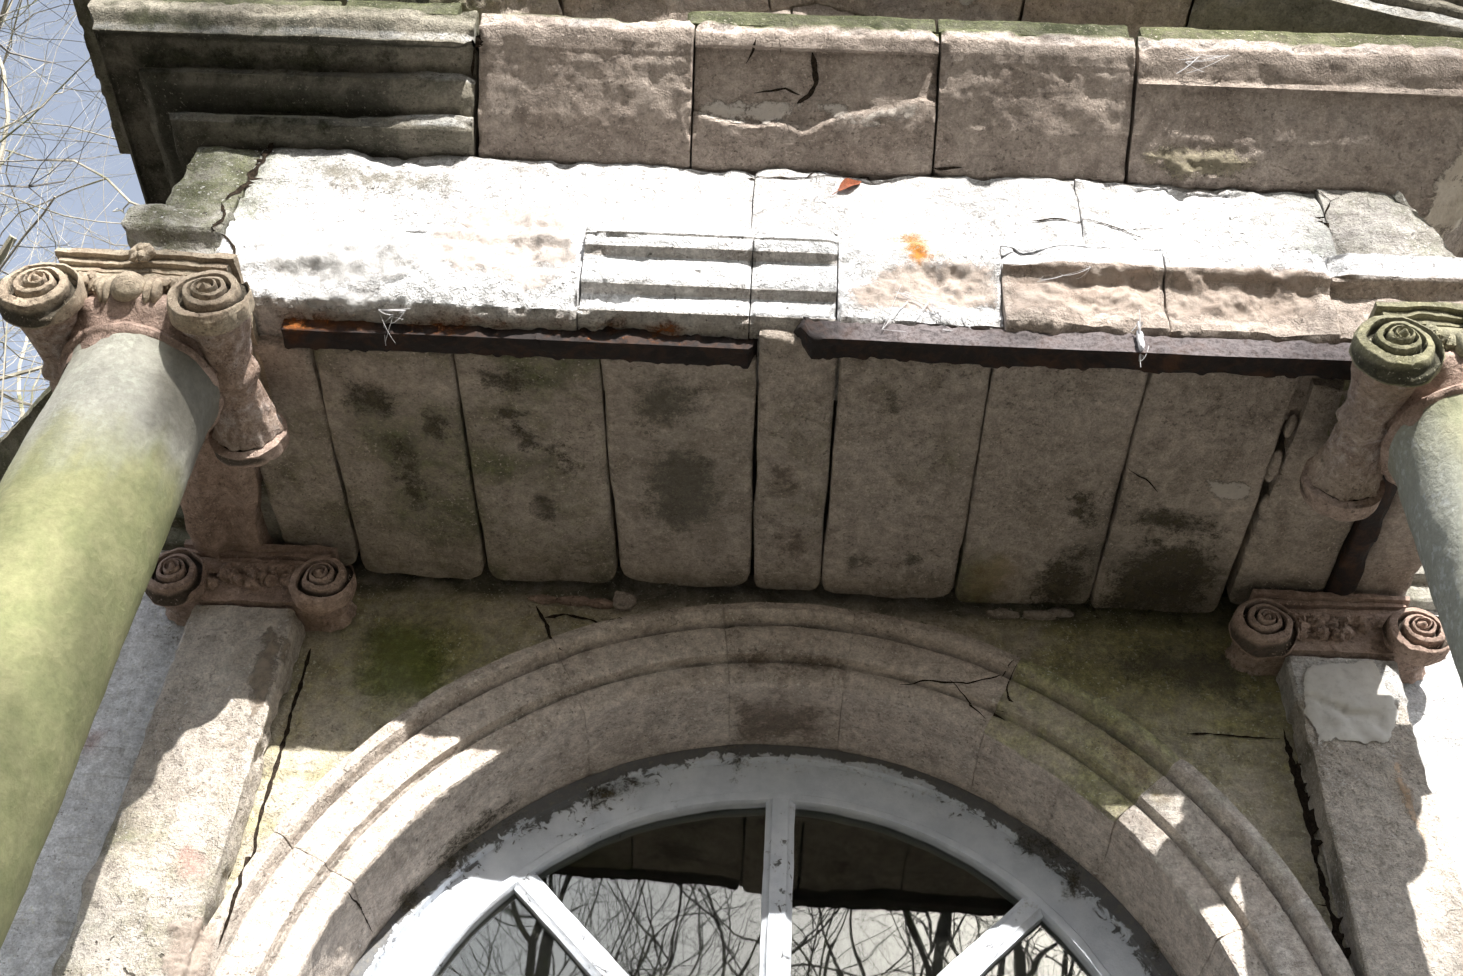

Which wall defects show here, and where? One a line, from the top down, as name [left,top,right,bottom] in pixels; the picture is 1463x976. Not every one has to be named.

crack [746,39,819,104]
crack [211,143,274,254]
spalling [1423,147,1463,243]
corrosion [903,234,933,262]
corrosion [280,312,357,340]
leakage [645,450,723,532]
leakage [1067,492,1098,525]
leakage [1027,508,1222,636]
leakage [356,626,443,699]
peeling [1302,659,1399,746]
crack [219,648,311,944]
crack [1187,729,1356,976]